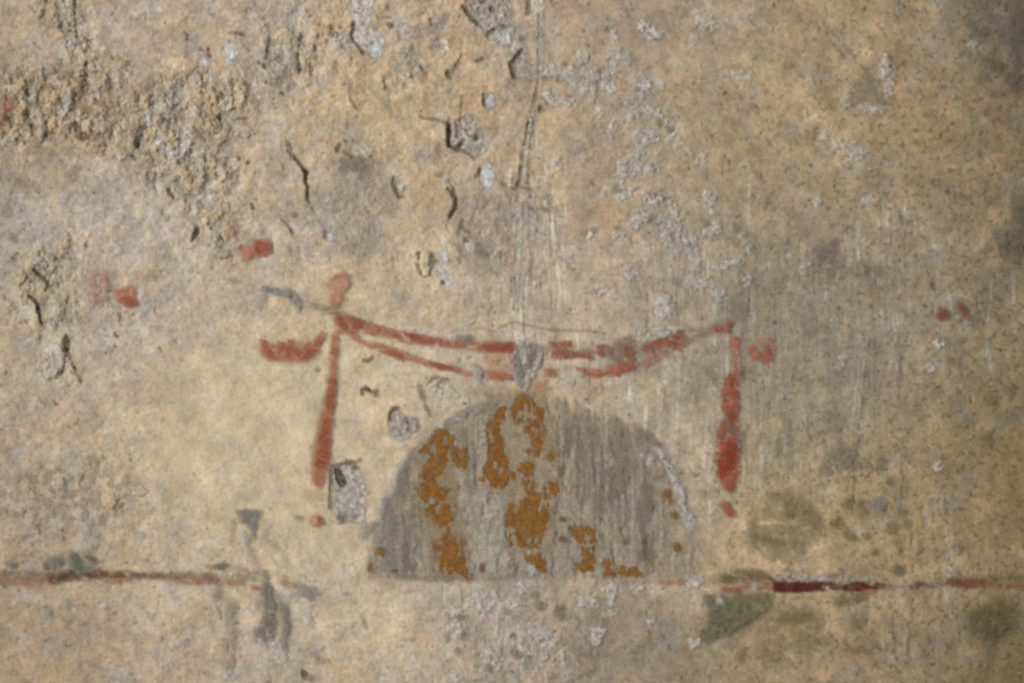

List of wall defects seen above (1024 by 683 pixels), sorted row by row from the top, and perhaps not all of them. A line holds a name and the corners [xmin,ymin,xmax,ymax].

peeling [9,0,105,153]
spalling [463,0,530,82]
peeling [127,32,255,199]
crack [287,145,310,203]
spalling [447,115,494,187]
peeling [188,202,233,260]
spalling [330,459,366,524]